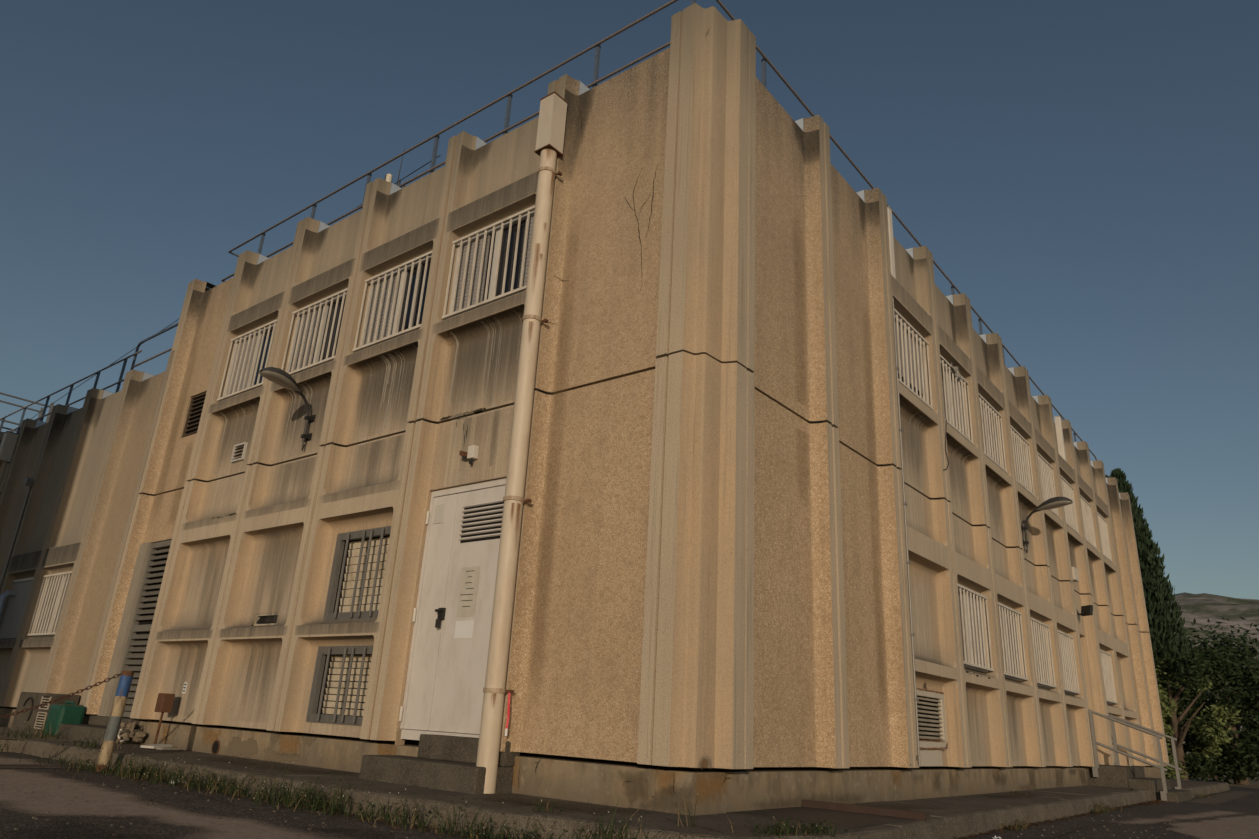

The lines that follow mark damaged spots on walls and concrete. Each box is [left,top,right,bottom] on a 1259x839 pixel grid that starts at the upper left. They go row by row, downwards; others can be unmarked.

crack [625,165,658,291]
leakage [950,302,967,334]